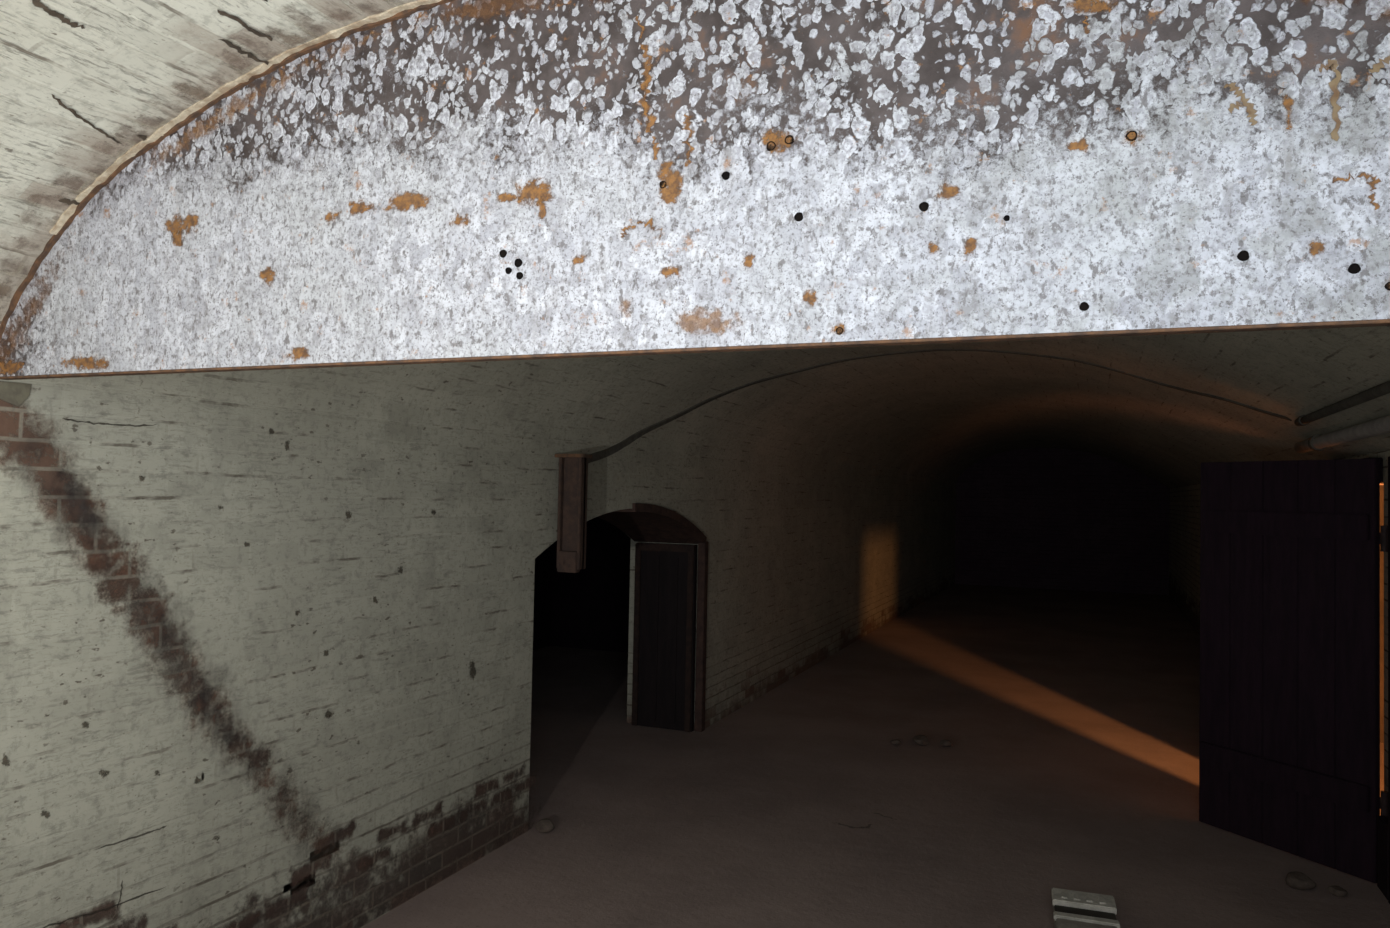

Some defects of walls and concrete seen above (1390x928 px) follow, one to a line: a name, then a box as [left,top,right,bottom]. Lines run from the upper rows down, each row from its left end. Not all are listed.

crack [32,0,85,29]
crack [218,0,272,65]
crack [52,94,147,144]
rust [635,16,695,204]
rust [1066,138,1089,151]
rust [0,0,559,375]
rust [938,183,960,199]
rust [1332,172,1381,211]
rust [964,238,976,255]
rust [803,290,817,306]
rust [680,307,742,335]
flaking render [0,381,536,928]